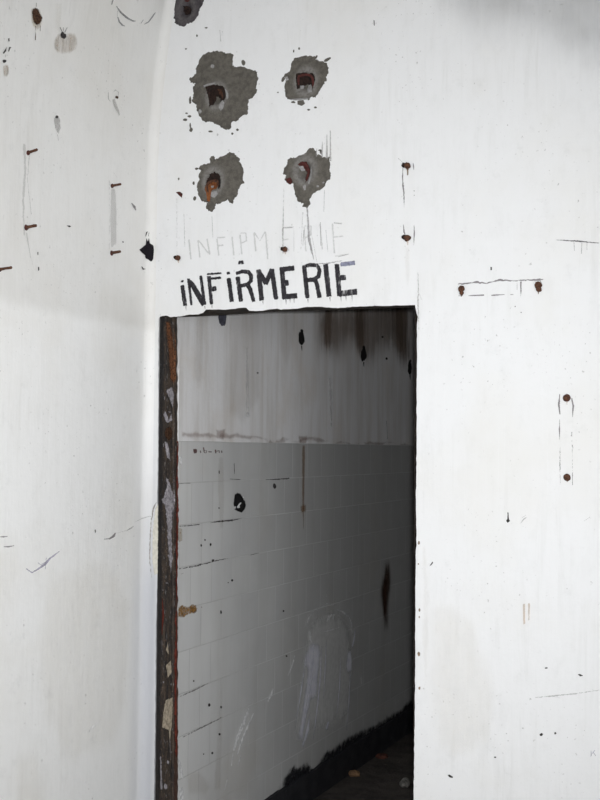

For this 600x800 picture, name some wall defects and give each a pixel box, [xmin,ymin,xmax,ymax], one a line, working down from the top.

spalling [174,0,204,27]
spalling [183,51,258,135]
spalling [277,47,331,111]
spalling [193,152,244,212]
spalling [283,148,331,208]
rust [166,322,176,383]
rust [174,441,202,757]
mould [320,701,413,764]
mould [283,766,312,788]